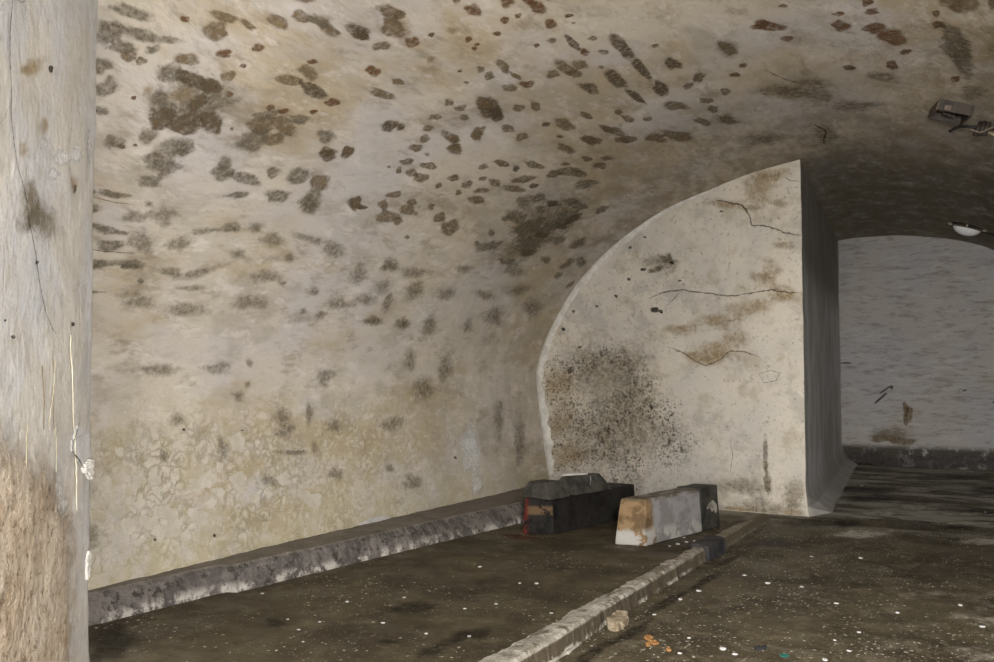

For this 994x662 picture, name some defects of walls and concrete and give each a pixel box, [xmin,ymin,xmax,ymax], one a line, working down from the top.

leakage [97,3,174,65]
leakage [204,11,256,40]
leakage [267,11,340,36]
leakage [547,34,686,110]
leakage [140,54,237,186]
leakage [471,97,528,141]
leakage [318,131,354,162]
leakage [349,191,417,225]
leakage [387,115,613,288]
crack [716,200,801,236]
crack [649,289,798,304]
crack [673,348,779,383]